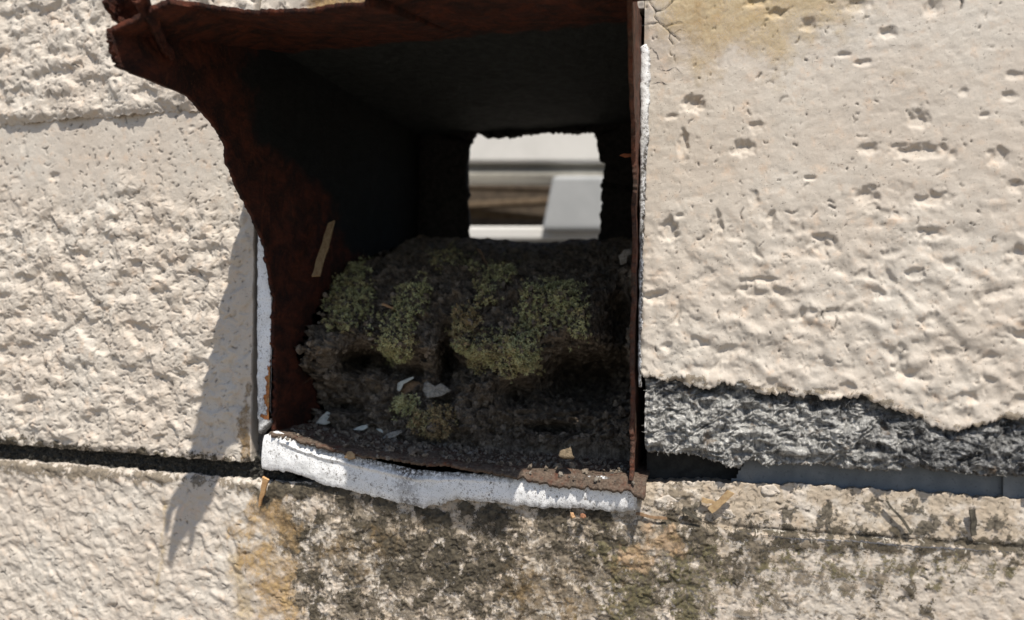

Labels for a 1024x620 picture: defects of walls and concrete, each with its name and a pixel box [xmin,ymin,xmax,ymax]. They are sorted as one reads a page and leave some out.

rust [310,0,365,8]
rust [260,324,271,420]
leakage [649,371,722,388]
spalling [641,377,1024,477]
leakage [0,380,1024,620]